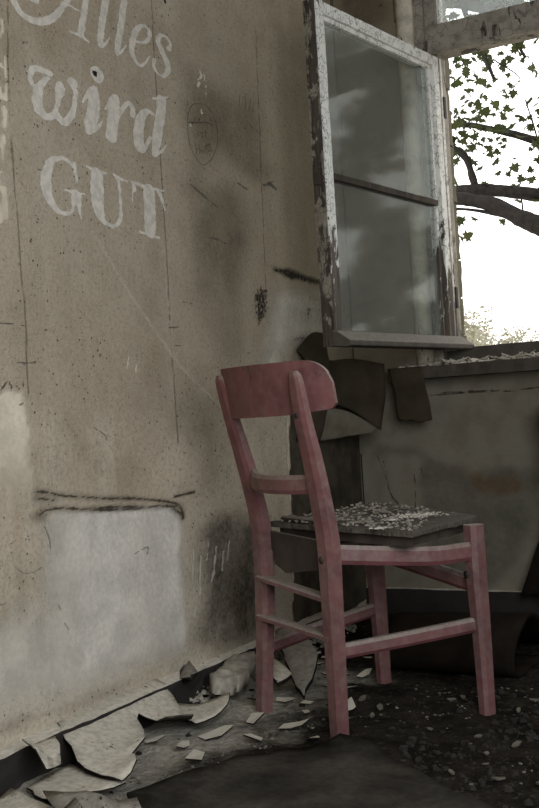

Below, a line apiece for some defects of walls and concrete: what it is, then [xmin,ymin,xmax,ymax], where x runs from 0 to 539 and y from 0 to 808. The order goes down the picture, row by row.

peeling [0,382,31,479]